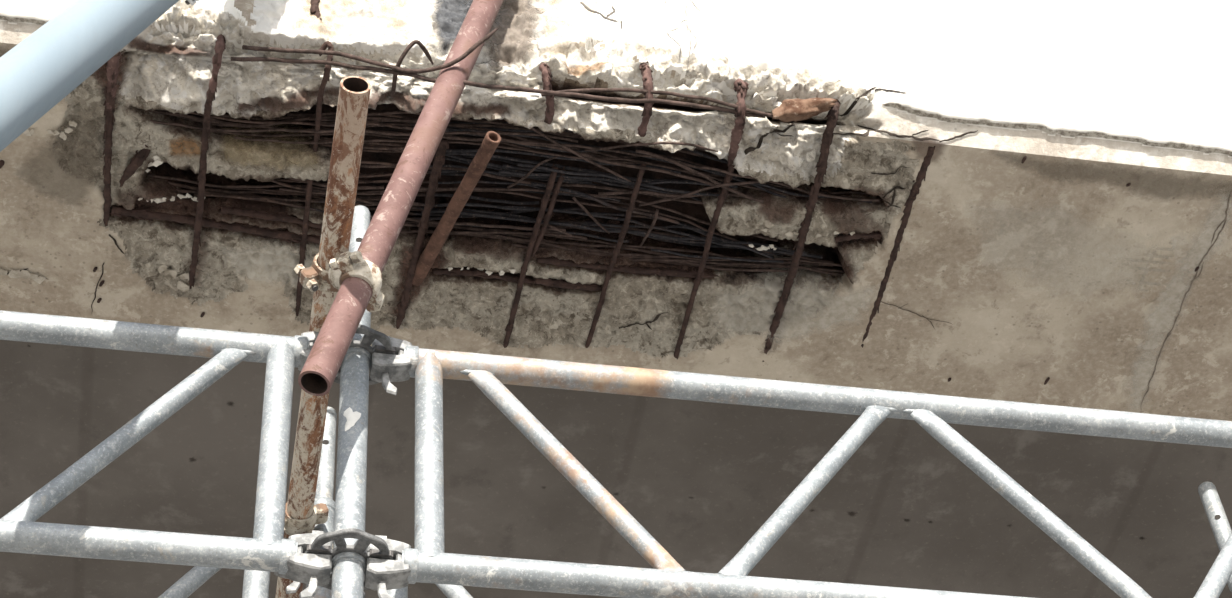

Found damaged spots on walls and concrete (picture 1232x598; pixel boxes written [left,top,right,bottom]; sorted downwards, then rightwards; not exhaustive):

rust [93,37,209,106]
rust [119,139,322,237]
spalling [22,0,454,306]
rust [238,88,339,114]
spalling [283,279,314,325]
rust [453,102,508,116]
rust [392,209,692,316]
spalling [370,0,920,359]
rust [760,194,795,224]
rust [820,186,884,276]
crack [833,86,978,208]
crack [1141,192,1232,410]